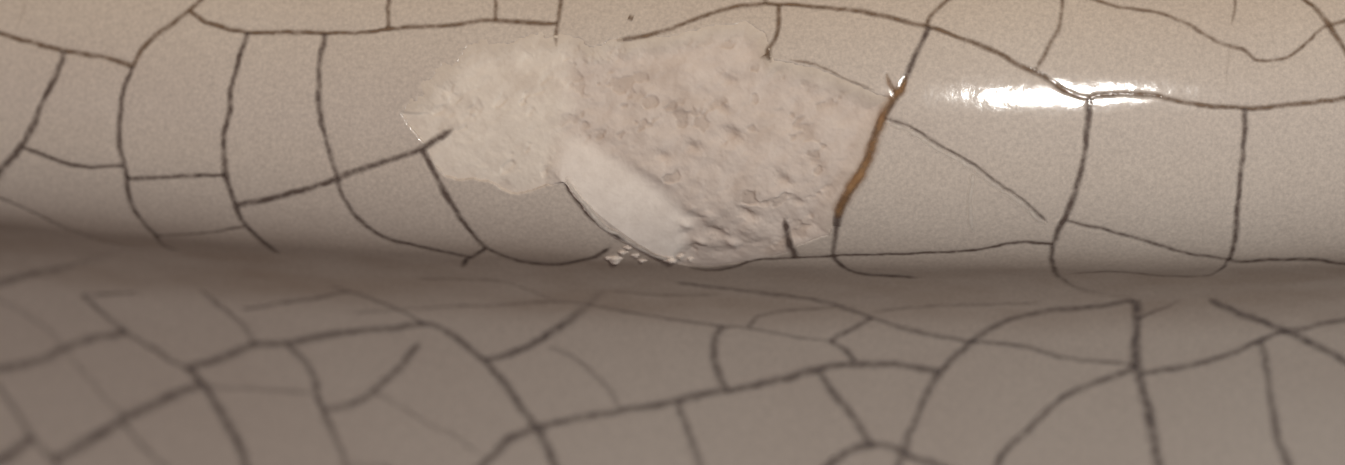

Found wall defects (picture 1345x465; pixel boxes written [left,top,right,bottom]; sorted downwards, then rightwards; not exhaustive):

crack [0,0,608,265]
spalling [403,21,890,266]
crack [624,0,1345,289]
crack [0,317,1017,465]
crack [997,300,1345,465]